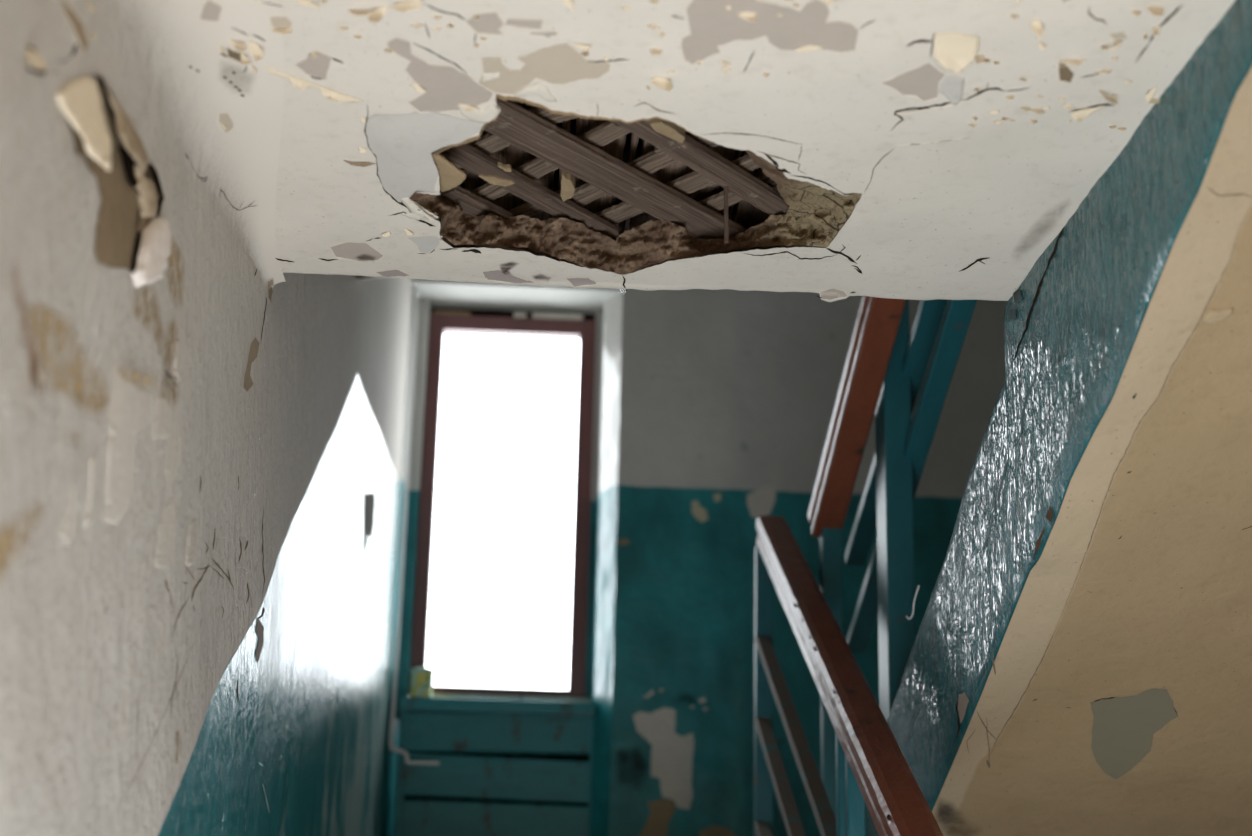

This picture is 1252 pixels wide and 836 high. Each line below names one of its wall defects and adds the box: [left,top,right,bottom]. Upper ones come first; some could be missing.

peeling [25,0,97,75]
peeling [199,0,224,22]
crack [1088,7,1108,25]
flaking render [56,74,179,287]
flaking render [220,0,876,288]
crack [986,188,1251,768]
crack [121,509,265,802]
peeling [633,689,694,836]
peeling [1090,688,1178,779]